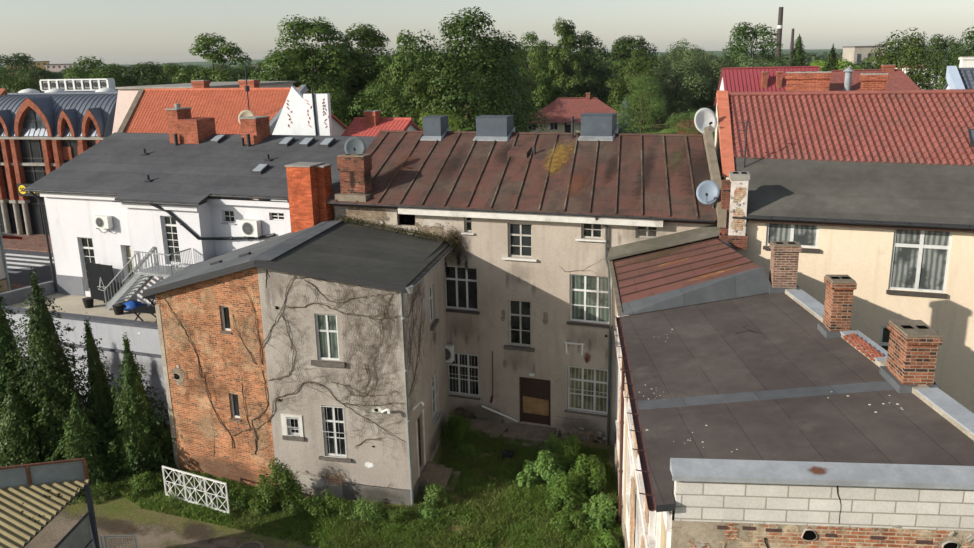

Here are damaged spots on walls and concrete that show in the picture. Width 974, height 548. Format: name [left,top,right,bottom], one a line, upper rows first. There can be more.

peeling [730,183,747,233]
flaking render [613,373,638,459]
flaking render [291,470,351,494]